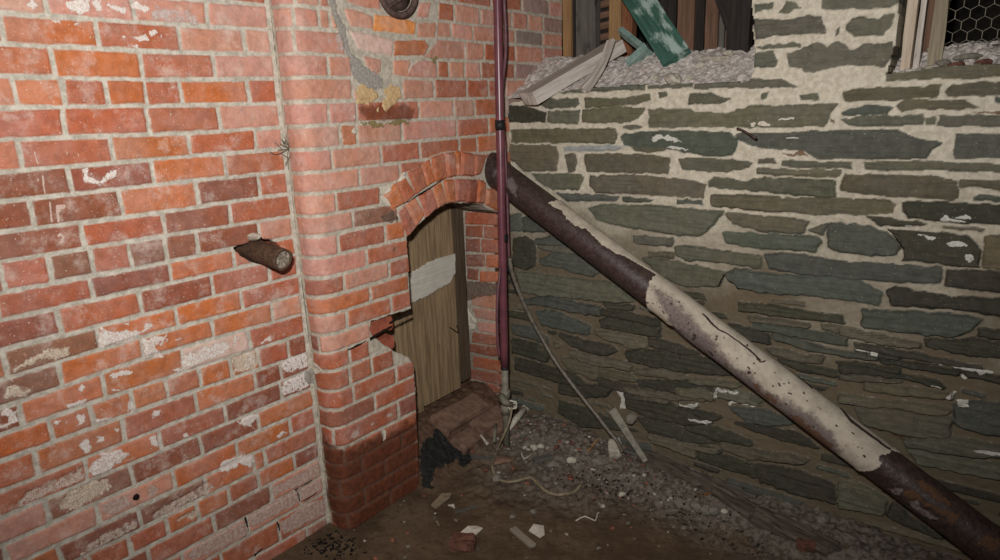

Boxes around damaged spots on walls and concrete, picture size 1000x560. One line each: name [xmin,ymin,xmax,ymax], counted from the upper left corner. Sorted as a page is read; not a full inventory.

leakage [65,0,197,50]
peeling [351,84,409,134]
leakage [82,167,117,186]
leakage [13,347,70,373]
leakage [98,321,181,358]
leakage [173,336,239,372]
leakage [281,353,309,395]
spalling [370,315,394,349]
leakage [0,384,31,428]
leakage [66,384,119,432]
leakage [11,436,130,507]
leakage [188,422,419,559]